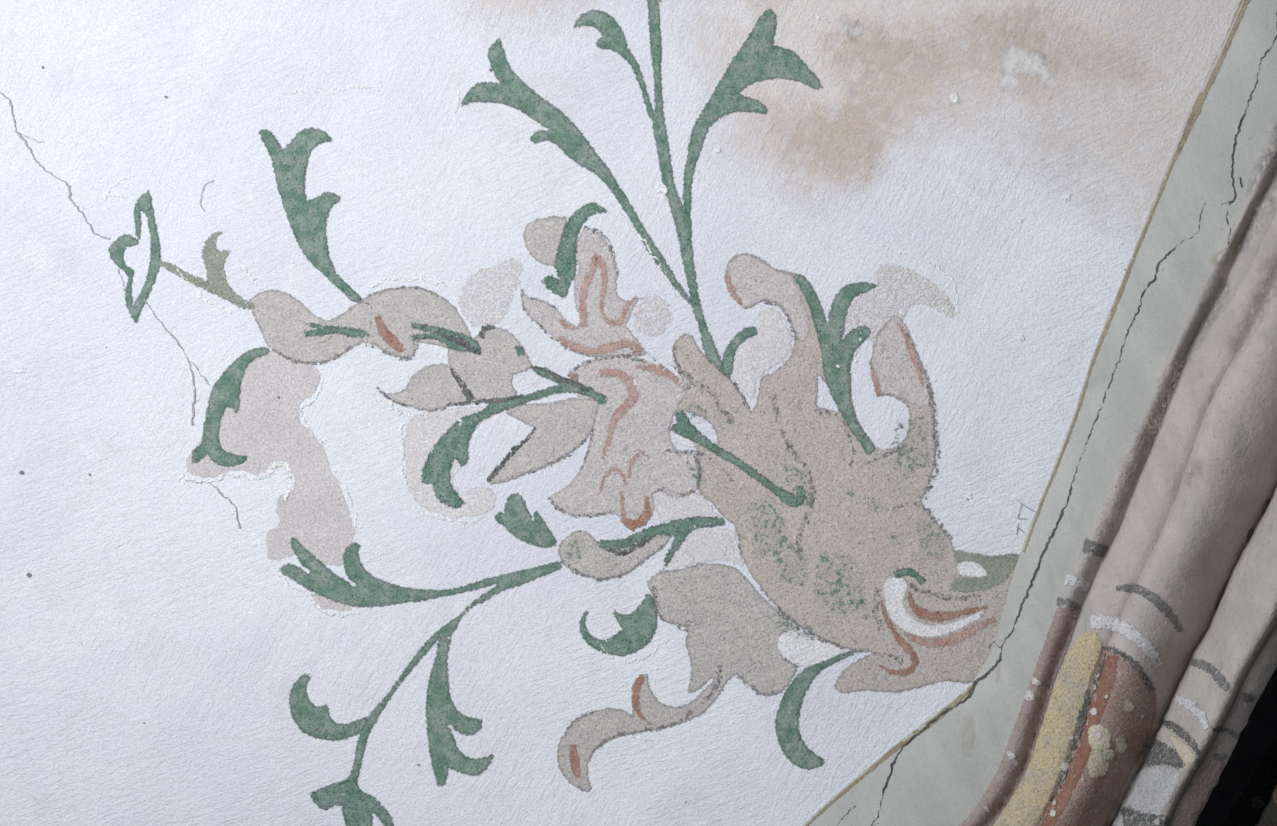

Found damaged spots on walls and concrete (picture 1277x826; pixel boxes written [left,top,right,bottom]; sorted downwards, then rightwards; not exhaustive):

crack [0,92,110,239]
water stain [700,0,1241,215]
crack [118,270,209,425]
crack [838,12,1277,826]